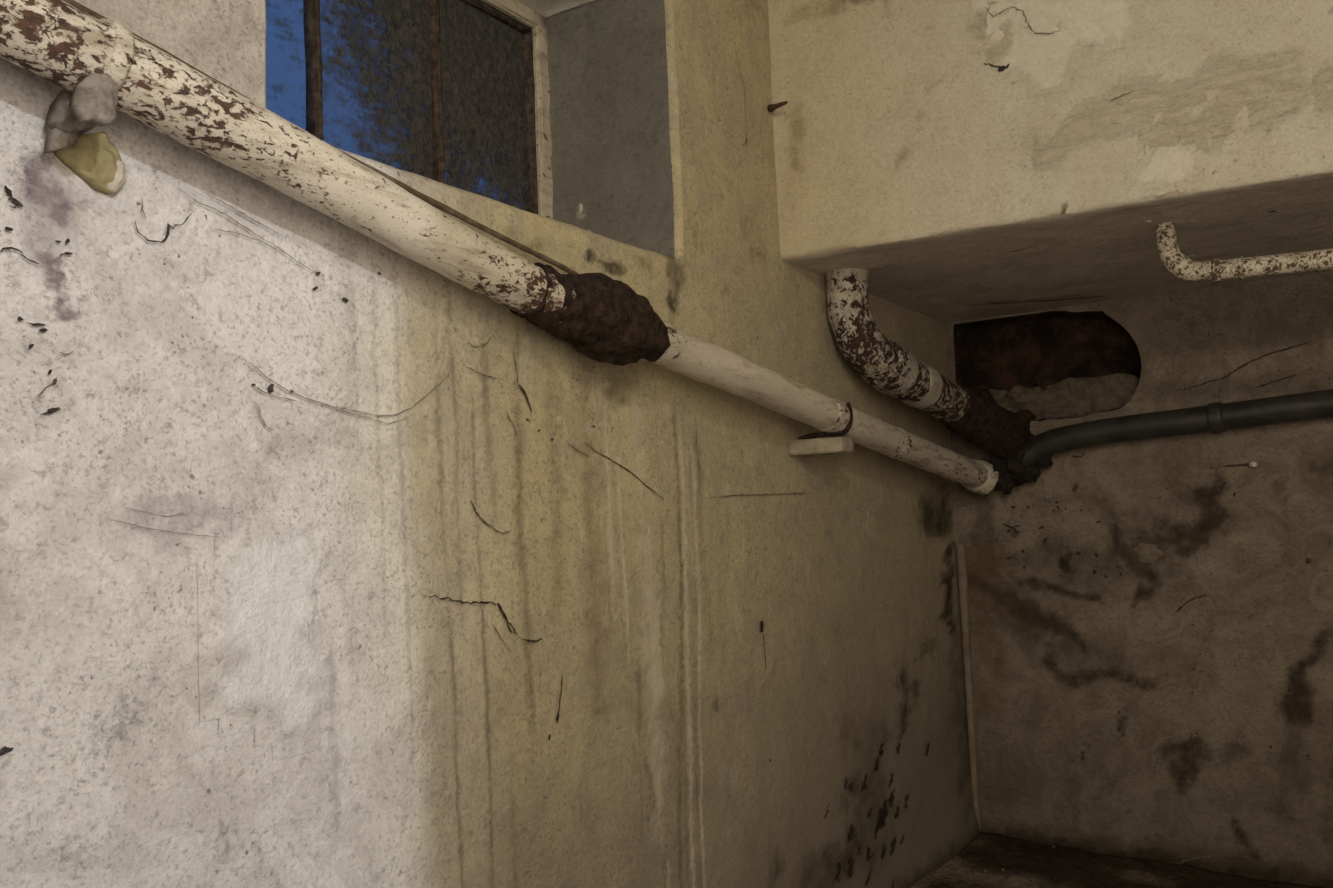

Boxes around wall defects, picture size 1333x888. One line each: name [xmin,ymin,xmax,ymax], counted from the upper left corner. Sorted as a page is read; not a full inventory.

leakage [25,152,72,224]
leakage [39,252,75,320]
leakage [923,499,955,633]
leakage [1006,521,1154,598]
crack [429,595,542,653]
leakage [1283,634,1323,722]
leakage [835,706,909,885]